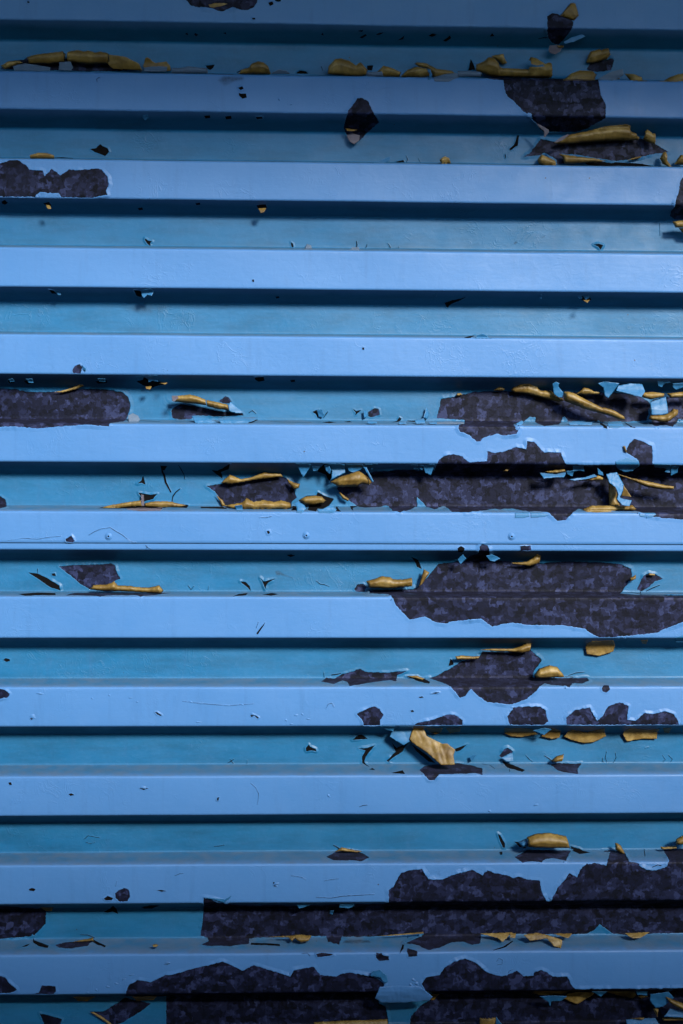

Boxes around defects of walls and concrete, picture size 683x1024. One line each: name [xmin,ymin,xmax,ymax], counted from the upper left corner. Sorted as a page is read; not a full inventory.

peeling [0,50,167,73]
peeling [341,95,382,147]
peeling [414,3,683,236]
peeling [0,159,113,209]
peeling [0,362,259,432]
peeling [200,381,683,536]
peeling [56,561,170,598]
peeling [352,542,683,644]
peeling [319,643,681,783]
peeling [0,906,54,949]
peeling [87,835,683,1024]